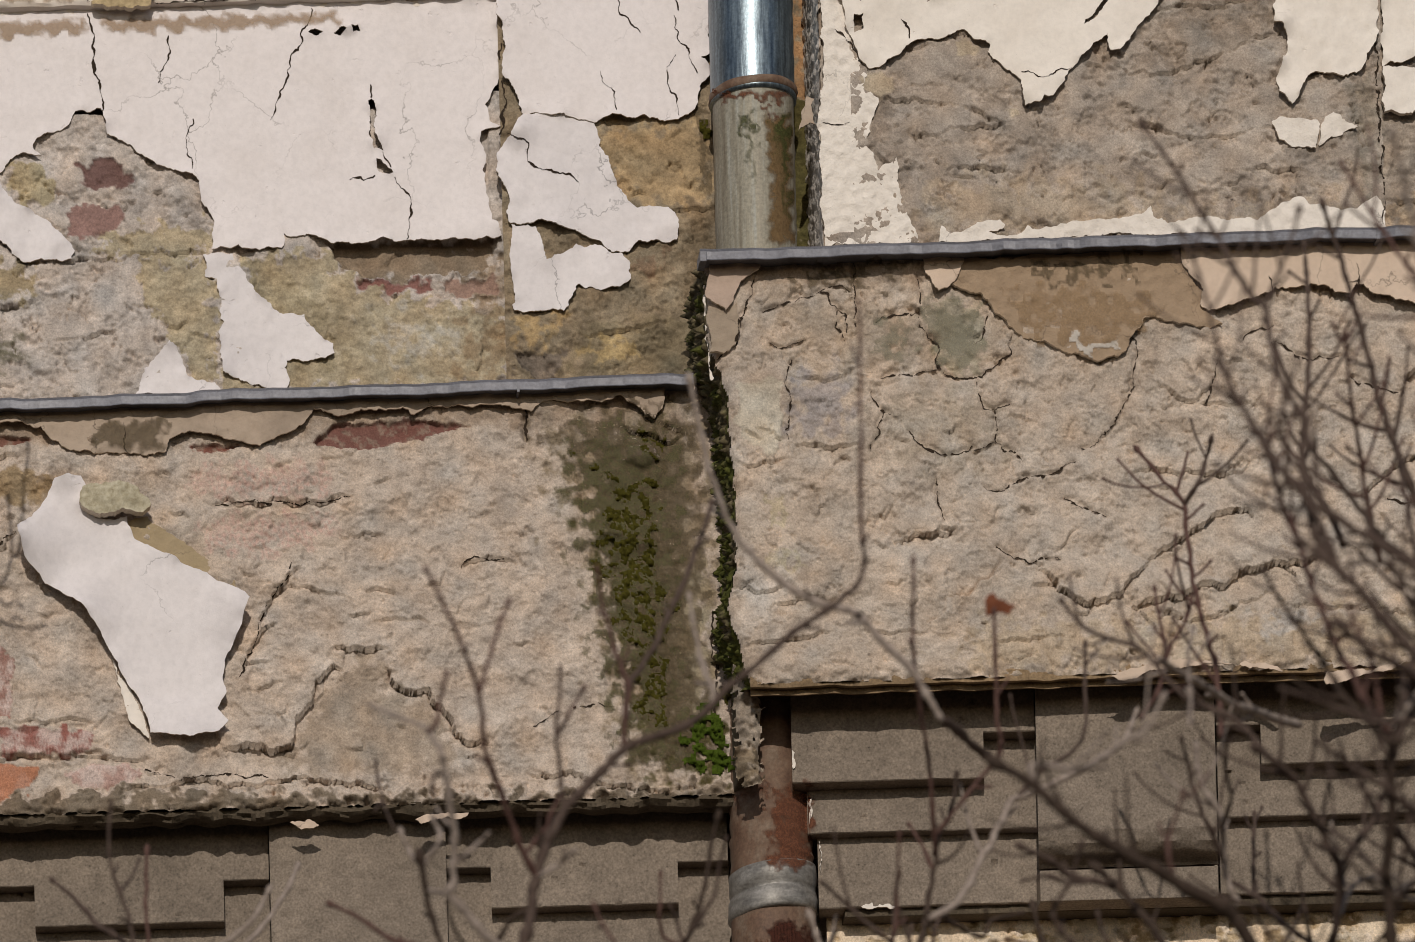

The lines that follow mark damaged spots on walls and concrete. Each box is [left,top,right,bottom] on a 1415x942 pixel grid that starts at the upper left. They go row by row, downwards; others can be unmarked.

crack [87,0,104,111]
crack [270,8,313,120]
crack [497,43,577,181]
rust [712,88,788,117]
spalling [0,16,760,399]
spalling [792,0,1415,363]
spalling [315,419,471,451]
crack [718,263,1138,520]
peeling [17,473,250,739]
damp [557,397,717,770]
rust [763,781,819,871]
rust [756,920,814,942]